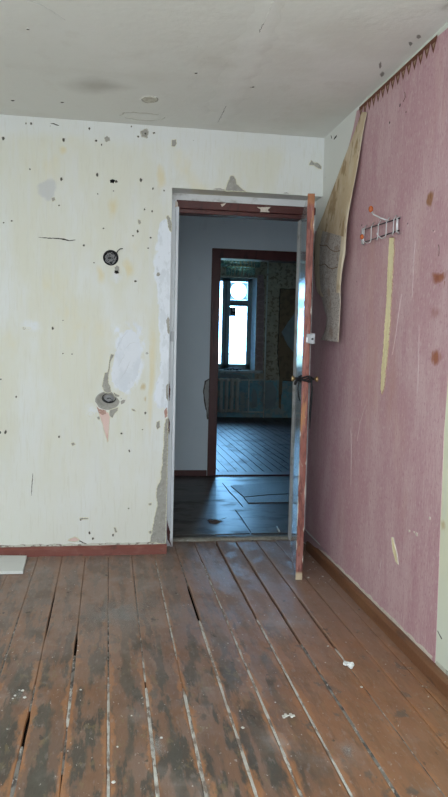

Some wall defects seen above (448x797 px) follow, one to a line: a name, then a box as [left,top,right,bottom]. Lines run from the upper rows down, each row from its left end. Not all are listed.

spalling [215,175,246,192]
spalling [95,354,136,442]
spalling [0,383,172,547]